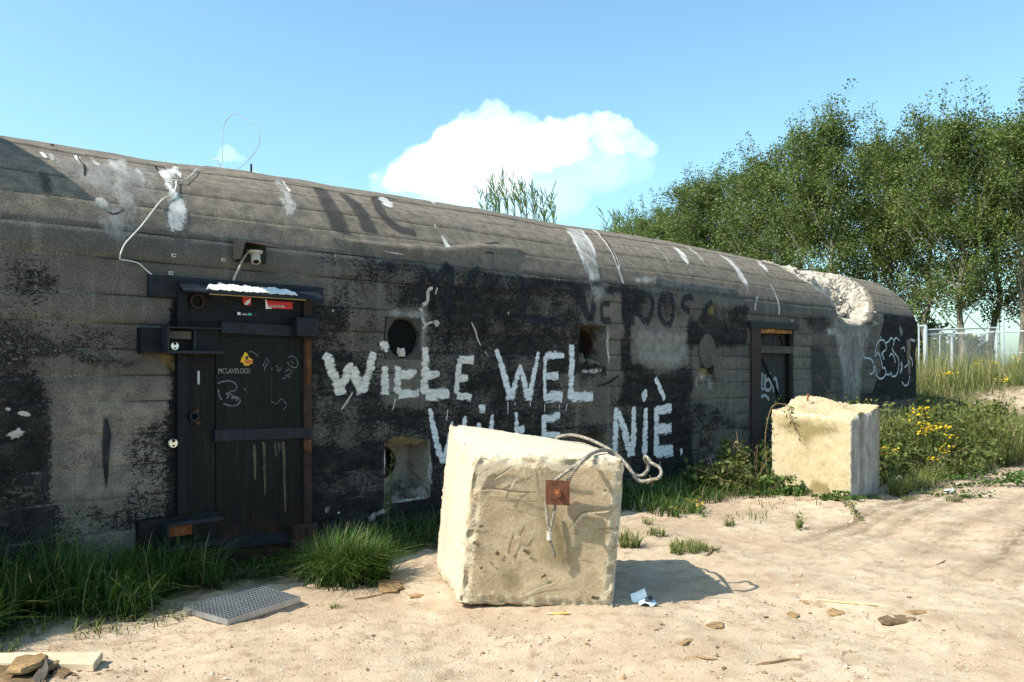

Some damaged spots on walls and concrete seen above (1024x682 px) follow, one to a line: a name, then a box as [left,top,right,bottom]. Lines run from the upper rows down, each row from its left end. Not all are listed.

leakage [40,152,187,236]
efflorescence [277,181,295,214]
spalling [761,260,877,330]
leakage [810,320,878,397]